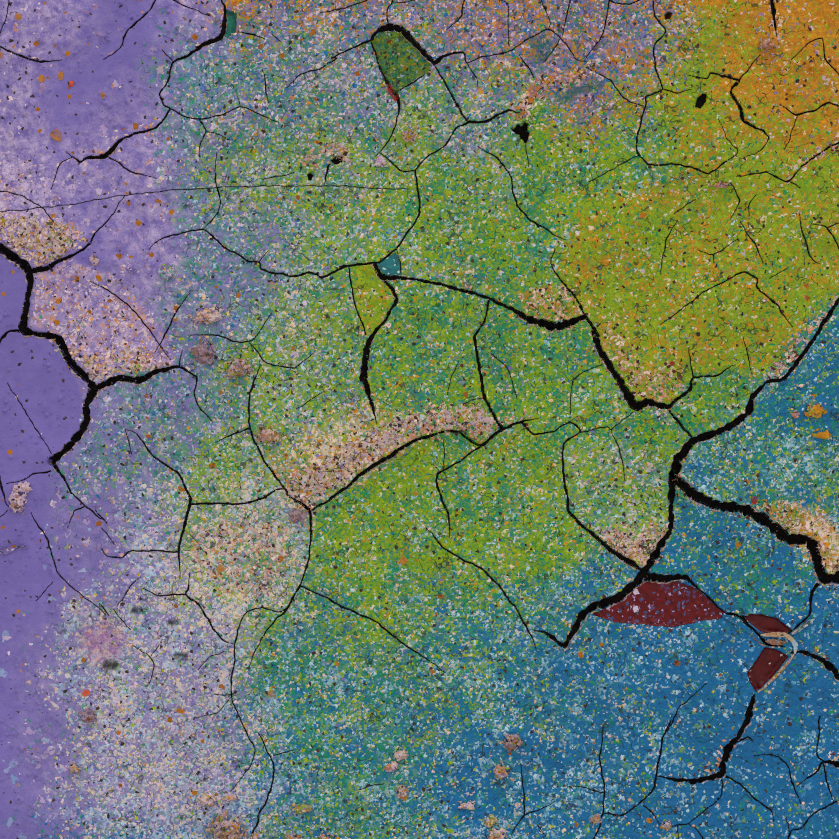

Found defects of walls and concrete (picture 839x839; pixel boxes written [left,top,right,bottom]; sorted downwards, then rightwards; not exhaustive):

crack [0,1,60,63]
crack [51,0,277,189]
crack [0,191,213,528]
crack [149,0,839,652]
crack [31,513,136,630]
crack [101,367,446,782]
spalling [594,581,815,693]
crack [791,650,839,681]
crack [250,733,293,838]
crack [509,765,555,839]
crack [574,683,839,839]